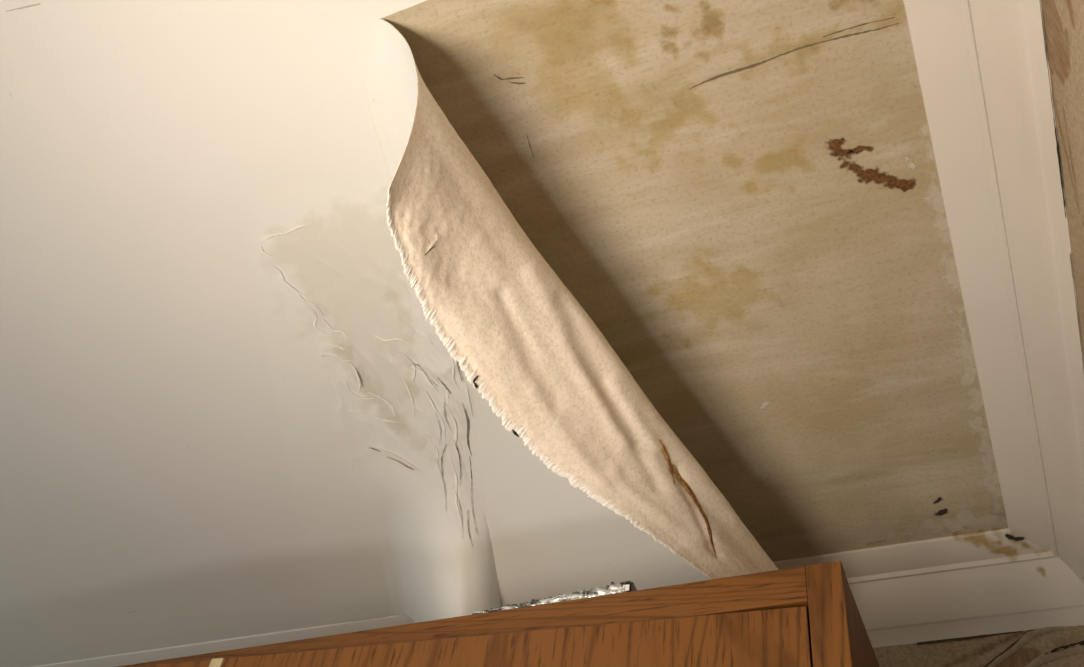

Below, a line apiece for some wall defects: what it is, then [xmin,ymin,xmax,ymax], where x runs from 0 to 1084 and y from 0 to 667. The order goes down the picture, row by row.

crack [689,17,899,90]
rust [828,138,915,192]